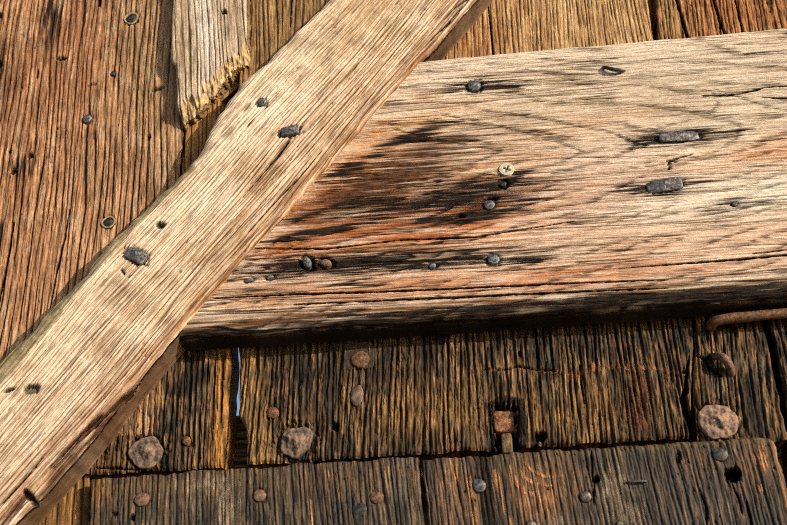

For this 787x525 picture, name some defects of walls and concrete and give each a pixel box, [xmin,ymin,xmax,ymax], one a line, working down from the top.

crack [675,0,689,38]
crack [703,86,787,100]
damp [234,121,560,285]
crack [578,365,586,404]
corrosion [516,362,685,441]
crack [675,356,722,426]